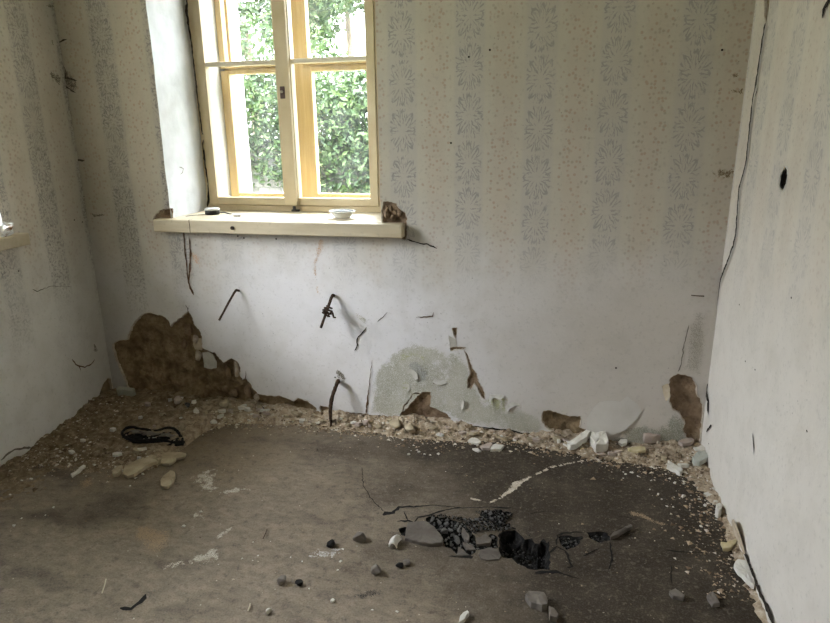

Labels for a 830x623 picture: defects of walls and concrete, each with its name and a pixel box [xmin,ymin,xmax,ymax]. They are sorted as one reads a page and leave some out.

crack [716,22,767,310]
flaking render [381,201,407,240]
flaking render [112,311,642,437]
flaking render [662,373,704,443]
crack [362,469,511,522]
crack [530,511,640,579]